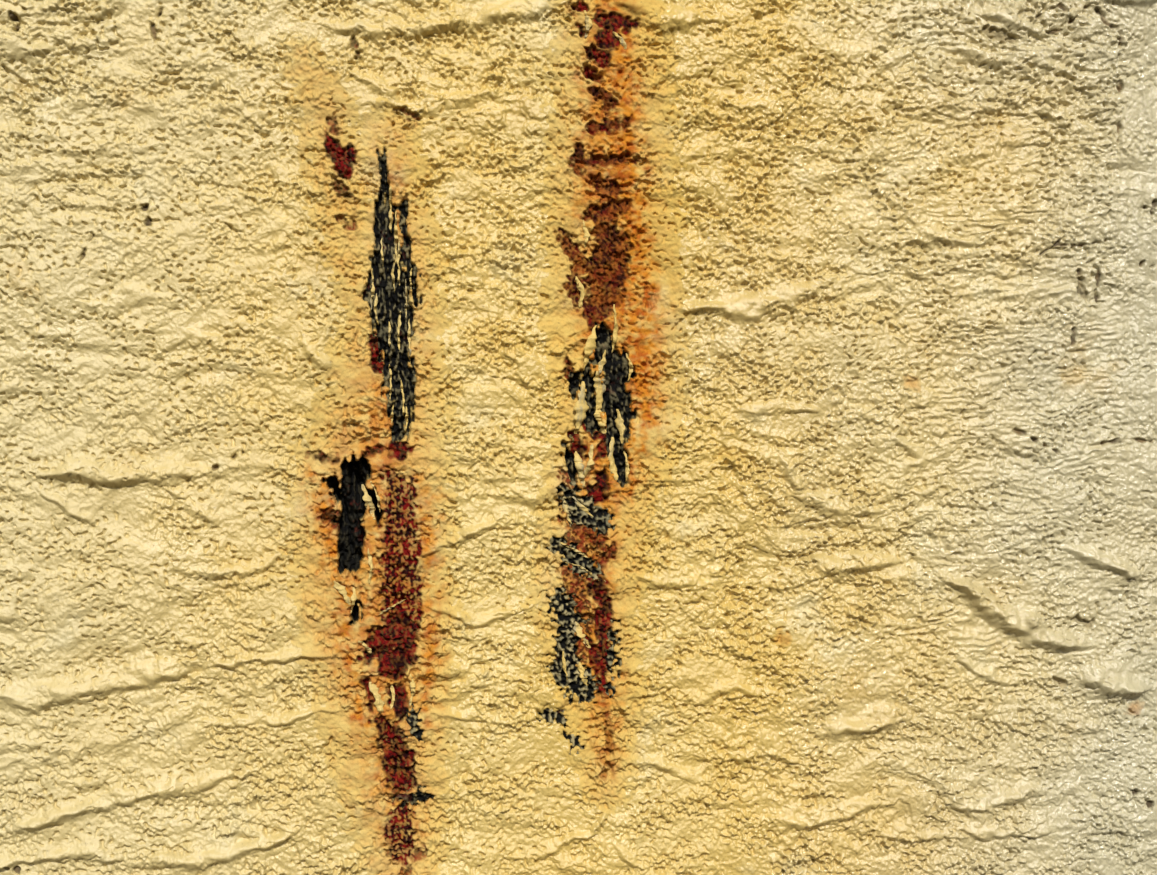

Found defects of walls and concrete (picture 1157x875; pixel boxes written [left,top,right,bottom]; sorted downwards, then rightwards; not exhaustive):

spalling [322,455,383,625]
rust [277,30,471,875]
spalling [362,147,422,464]
spalling [536,582,623,755]
spalling [545,304,637,582]
rust [521,0,697,815]